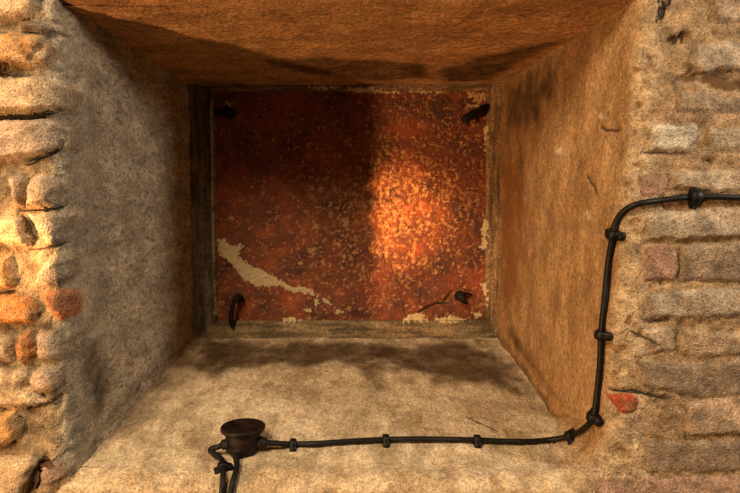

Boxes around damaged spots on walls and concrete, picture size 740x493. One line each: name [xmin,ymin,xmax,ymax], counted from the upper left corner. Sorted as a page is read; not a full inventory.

crack [0,111,59,119]
crack [26,143,64,165]
peeling [210,99,344,324]
crack [417,292,451,314]
water stain [197,342,517,390]
crack [608,388,667,399]